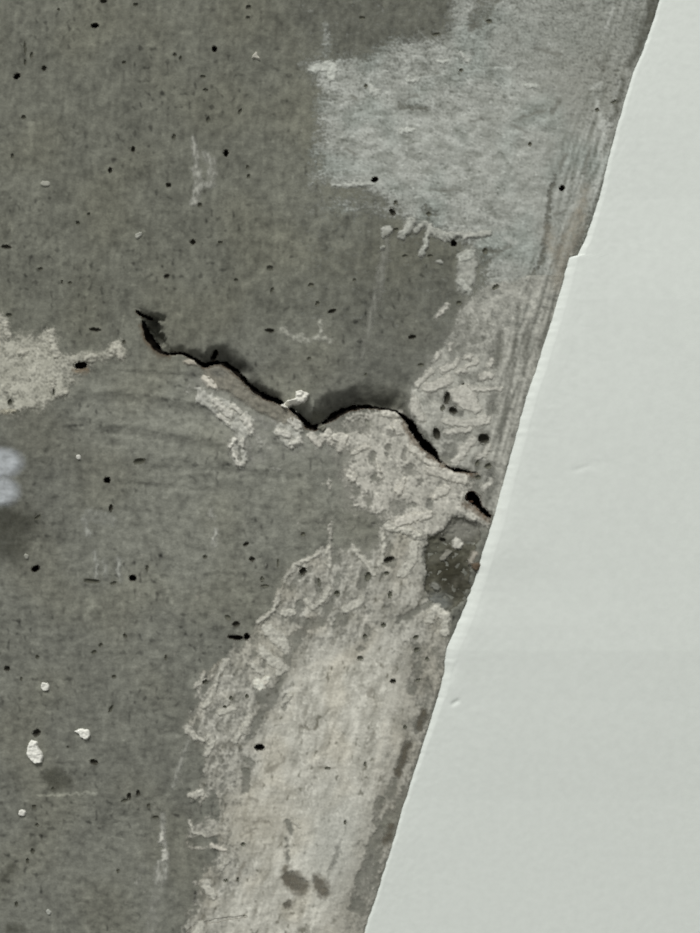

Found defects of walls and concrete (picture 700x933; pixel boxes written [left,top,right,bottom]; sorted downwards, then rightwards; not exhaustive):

crack [135,309,492,519]